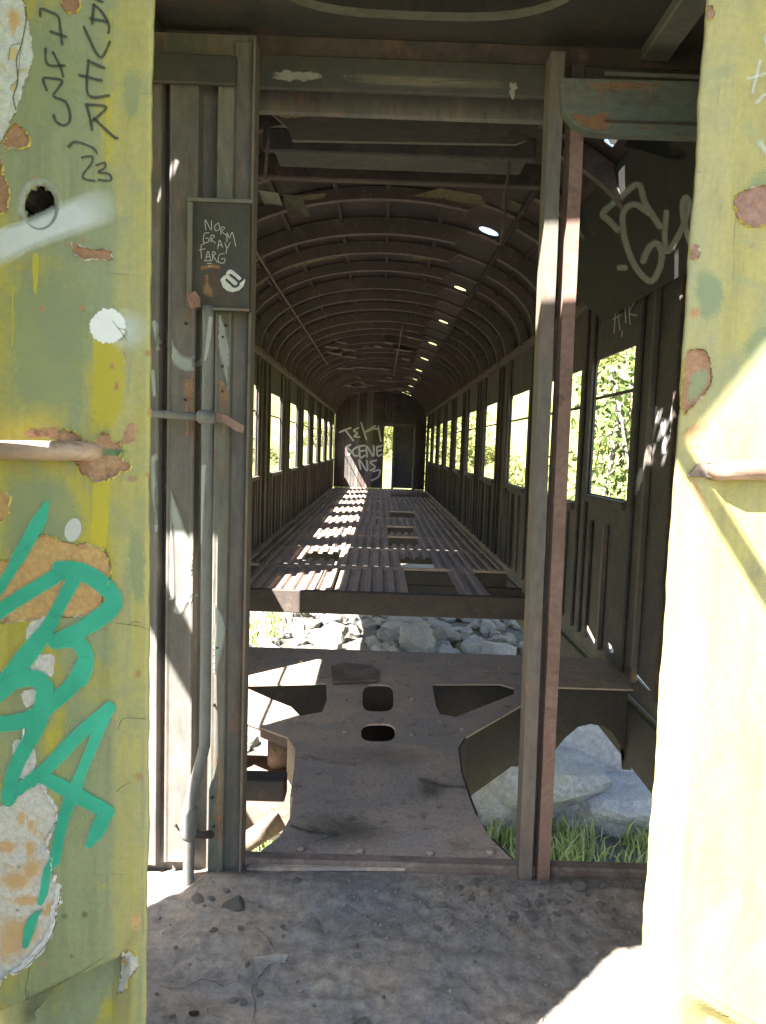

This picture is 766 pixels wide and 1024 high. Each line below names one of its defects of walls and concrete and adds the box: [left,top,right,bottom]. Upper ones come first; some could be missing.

peeling [0,0,75,141]
peeling [679,348,713,415]
peeling [25,422,138,483]
peeling [64,721,94,795]
peeling [0,749,89,986]
peeling [116,950,140,994]